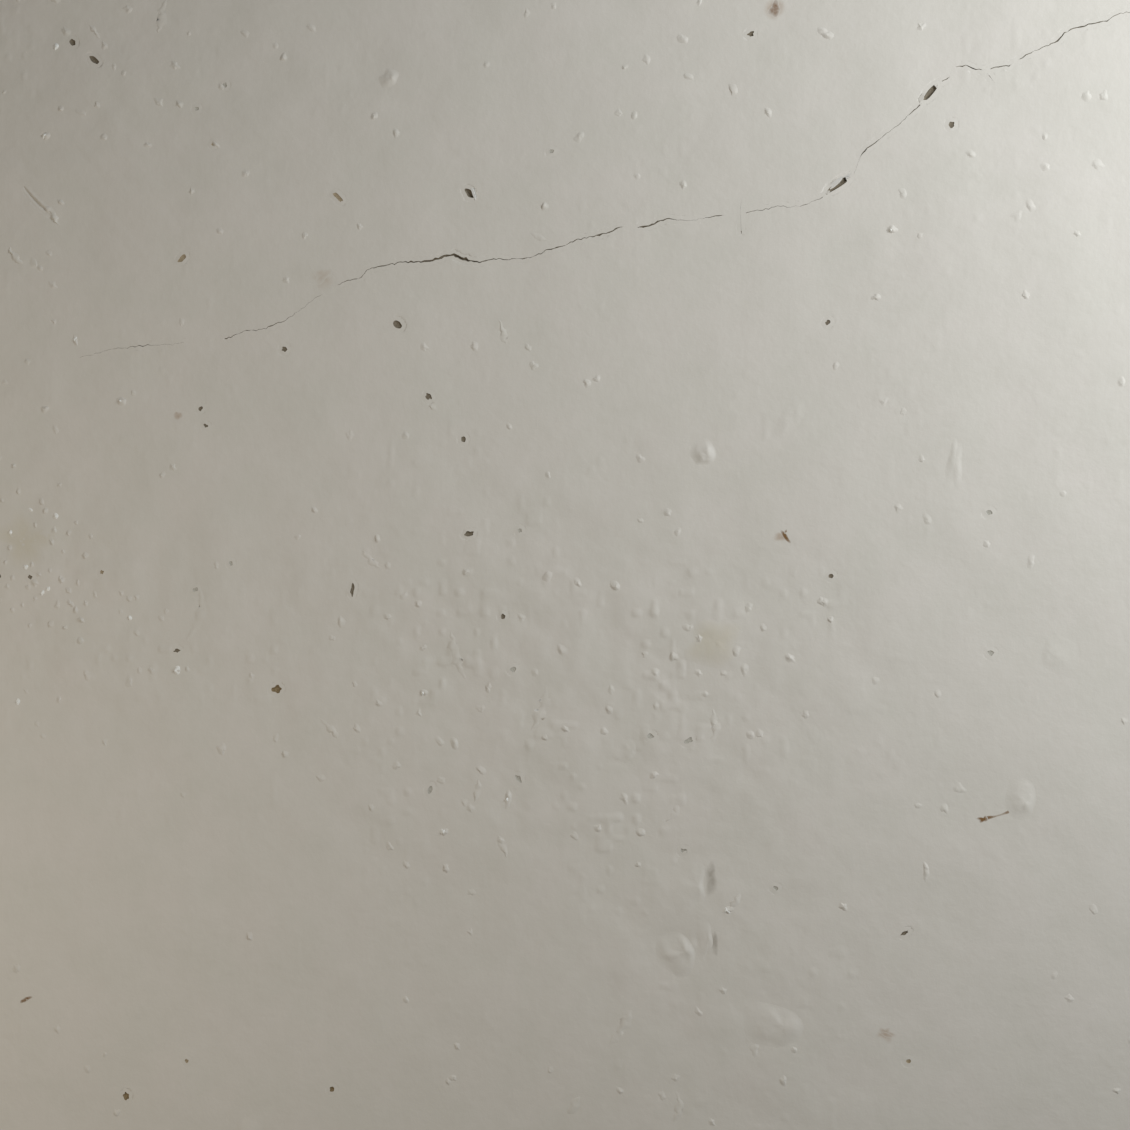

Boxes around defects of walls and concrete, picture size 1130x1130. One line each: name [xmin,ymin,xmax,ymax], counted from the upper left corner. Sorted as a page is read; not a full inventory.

crack [220,7,1130,343]
crack [77,338,187,362]